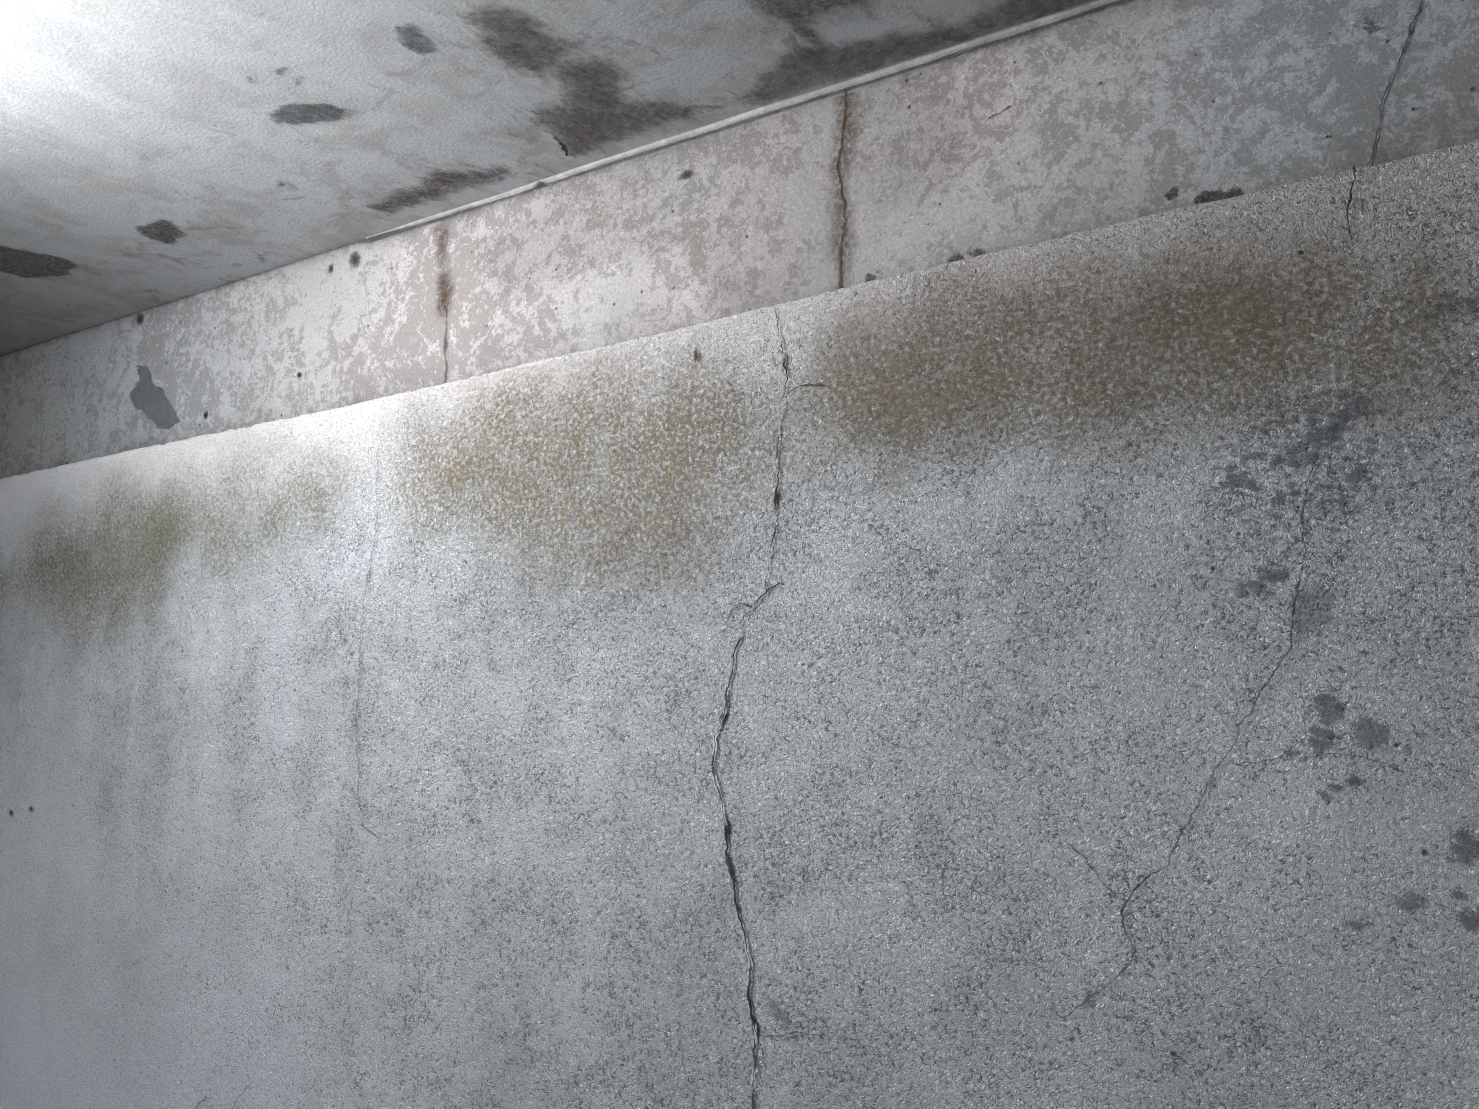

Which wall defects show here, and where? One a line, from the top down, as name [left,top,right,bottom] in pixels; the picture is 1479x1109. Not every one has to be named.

crack [836,89,847,289]
water stain [754,0,1074,101]
crack [1346,1,1422,245]
spalling [130,365,181,429]
water stain [410,366,776,577]
water stain [818,269,1454,447]
crack [711,306,825,1109]
crack [1063,462,1330,1018]